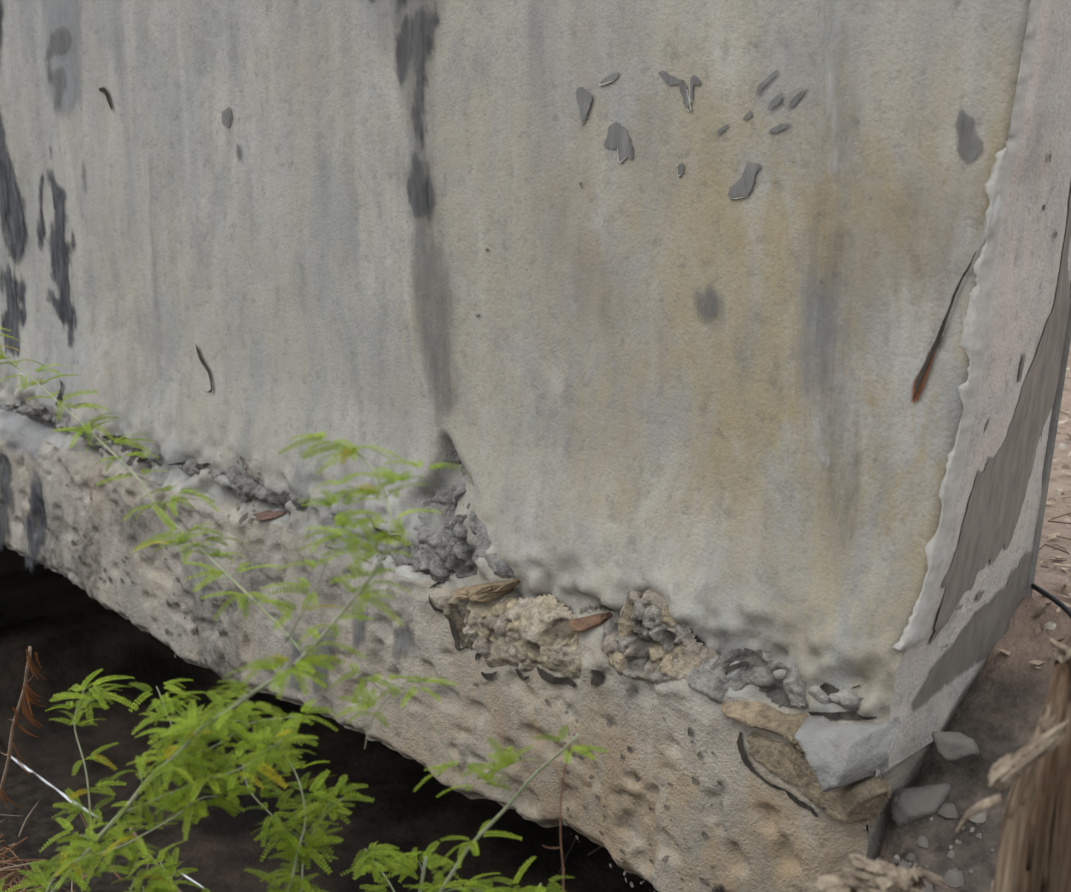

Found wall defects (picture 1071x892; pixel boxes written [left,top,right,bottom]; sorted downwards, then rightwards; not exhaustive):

damp [47,0,76,108]
flaking render [576,73,619,125]
flaking render [603,122,633,163]
flaking render [658,71,701,112]
damp [0,123,76,356]
damp [396,0,448,406]
rust [911,350,936,402]
peeling [893,0,1071,650]
damp [0,450,46,572]
spalling [0,401,308,521]
spalling [374,447,902,827]
crack [737,731,818,817]